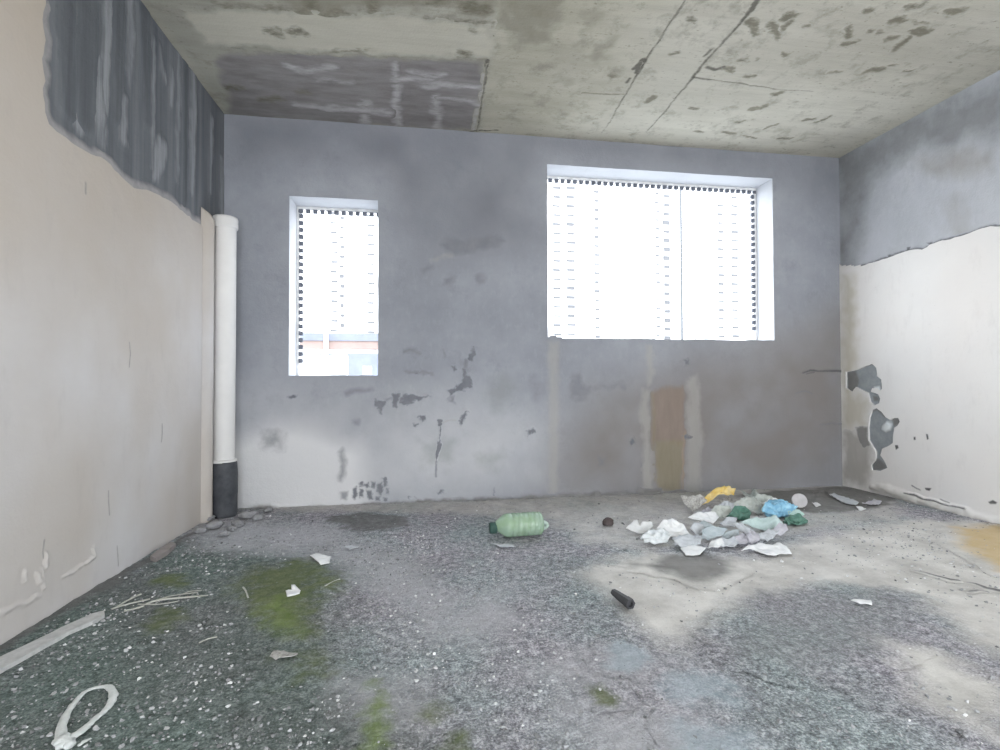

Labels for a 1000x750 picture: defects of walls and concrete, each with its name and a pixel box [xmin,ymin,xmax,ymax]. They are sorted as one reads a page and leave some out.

peeling [42,0,224,224]
crack [579,0,688,134]
crack [644,0,817,133]
spalling [372,344,480,430]
peeling [847,364,900,471]
peeling [337,474,420,503]